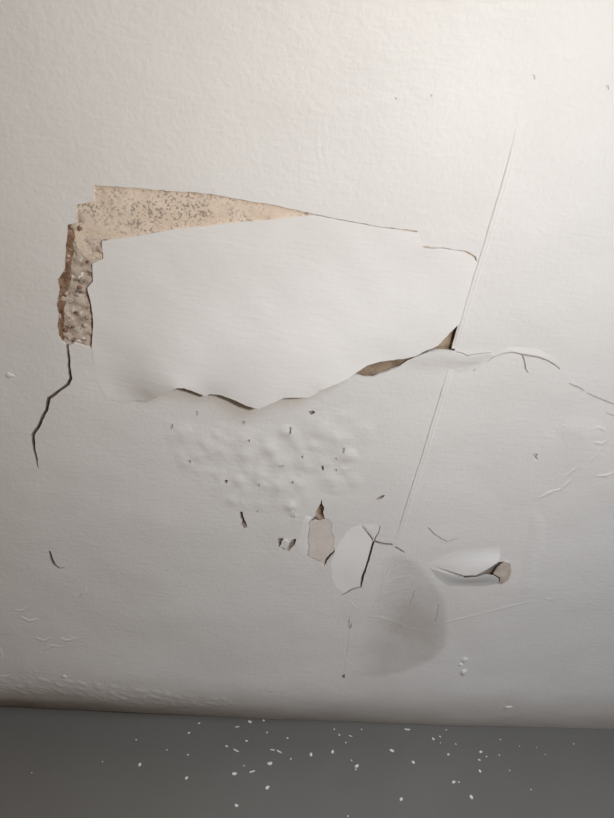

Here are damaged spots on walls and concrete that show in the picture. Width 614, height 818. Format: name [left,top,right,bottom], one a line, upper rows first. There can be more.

peeling [57,185,493,409]
crack [31,344,72,468]
crack [456,346,614,417]
peeling [278,501,379,593]
peeling [427,547,511,586]